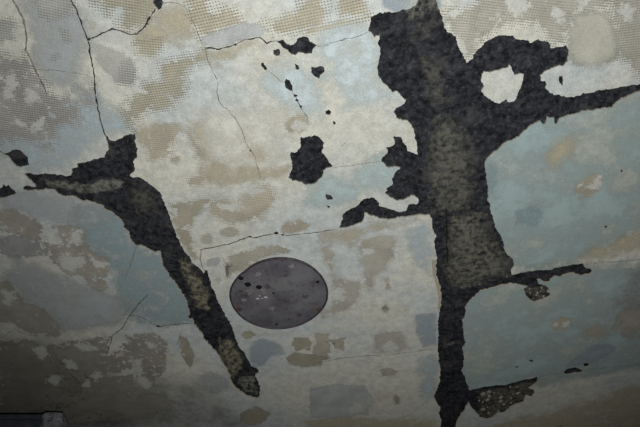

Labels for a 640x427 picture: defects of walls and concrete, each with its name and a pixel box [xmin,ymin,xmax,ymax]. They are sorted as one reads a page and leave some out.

crack [13,0,46,92]
crack [55,0,274,175]
spalling [0,0,290,426]
crack [200,230,331,270]
spalling [257,0,640,427]